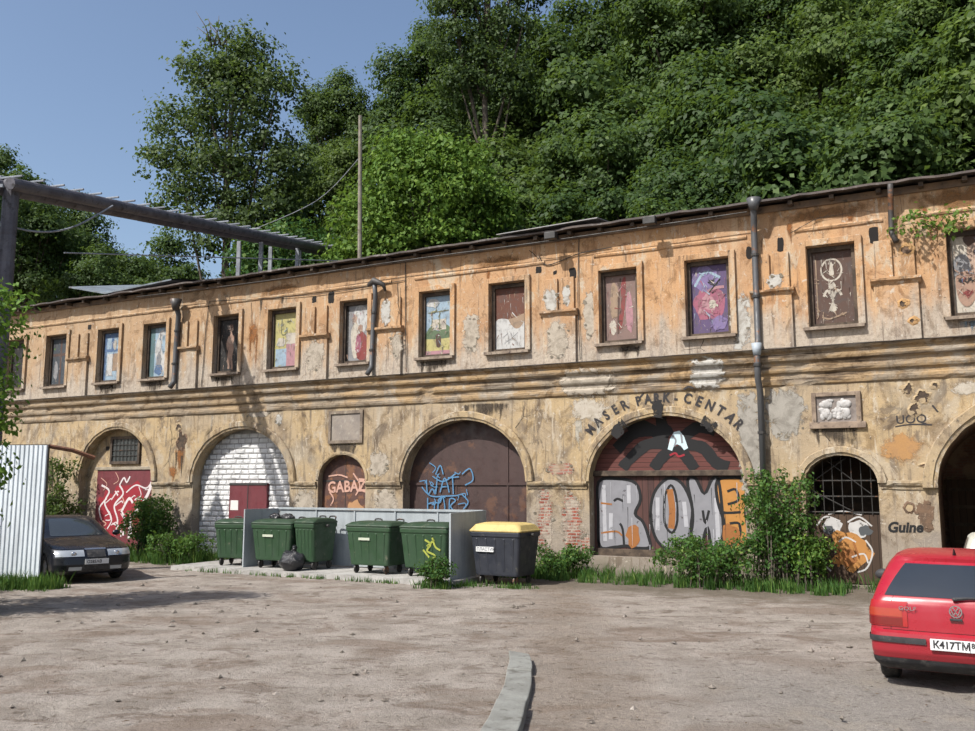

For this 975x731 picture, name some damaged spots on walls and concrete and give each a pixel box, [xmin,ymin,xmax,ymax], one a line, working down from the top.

rust [249,324,258,363]
flaking render [462,314,480,354]
flaking render [542,267,576,359]
flaking render [583,292,594,340]
spalling [897,298,920,326]
flaking render [559,367,616,398]
flaking render [690,356,725,389]
spalling [533,489,590,553]